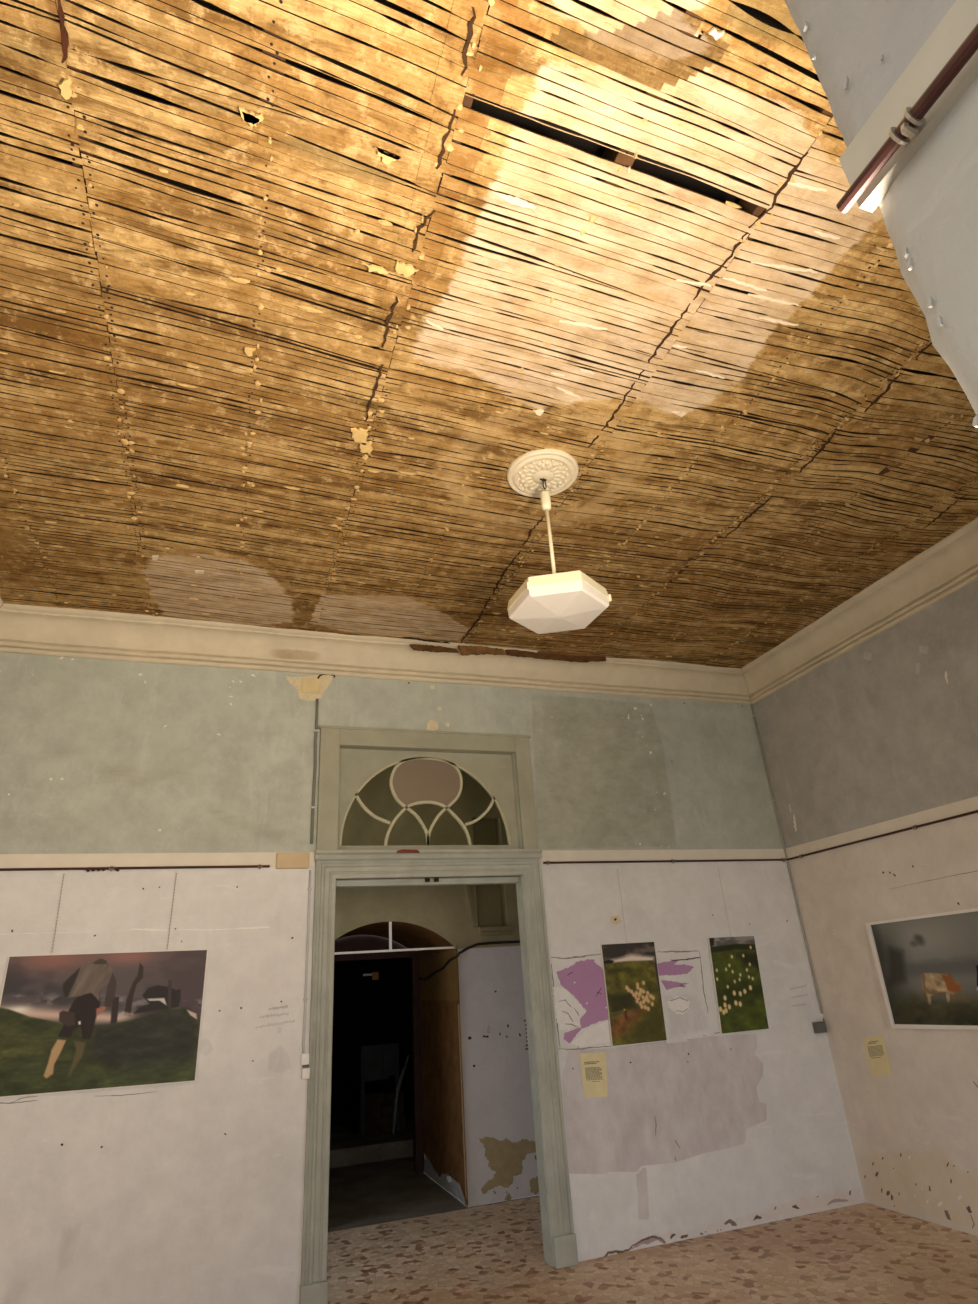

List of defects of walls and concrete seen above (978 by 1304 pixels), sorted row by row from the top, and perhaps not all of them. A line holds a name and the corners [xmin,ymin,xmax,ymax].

crack [58,0,69,63]
leakage [690,0,817,74]
crack [436,110,456,169]
leakage [253,0,585,410]
crack [412,211,435,252]
leakage [751,261,818,273]
leakage [676,277,799,326]
crack [365,296,399,421]
leakage [551,368,594,399]
flaking render [424,1150,468,1207]
flaking render [479,1137,539,1201]
flaking render [604,1219,737,1257]